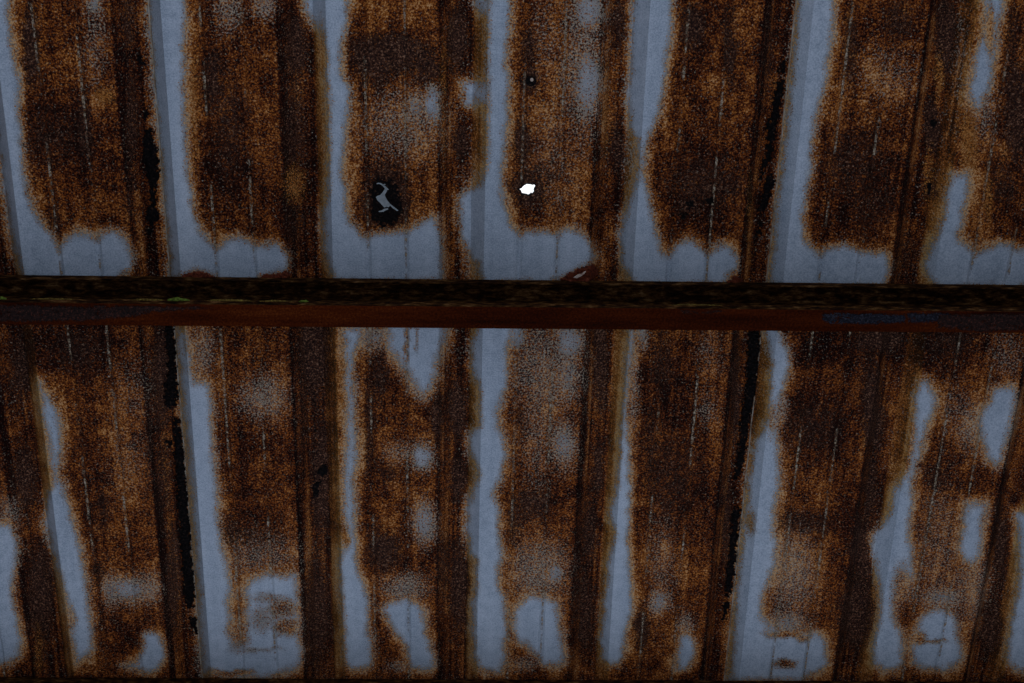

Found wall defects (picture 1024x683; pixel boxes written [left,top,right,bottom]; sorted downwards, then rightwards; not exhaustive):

corrosion [4,0,803,283]
corrosion [799,0,1024,285]
corrosion [0,324,1024,682]